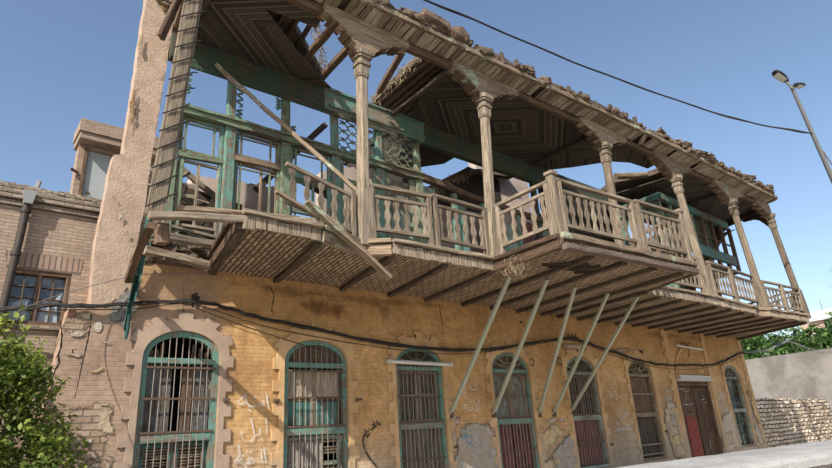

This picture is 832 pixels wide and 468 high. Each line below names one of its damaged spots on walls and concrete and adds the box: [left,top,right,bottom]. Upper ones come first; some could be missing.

flaking render [62,310,103,337]
crack [47,315,92,402]
flaking render [49,402,114,468]